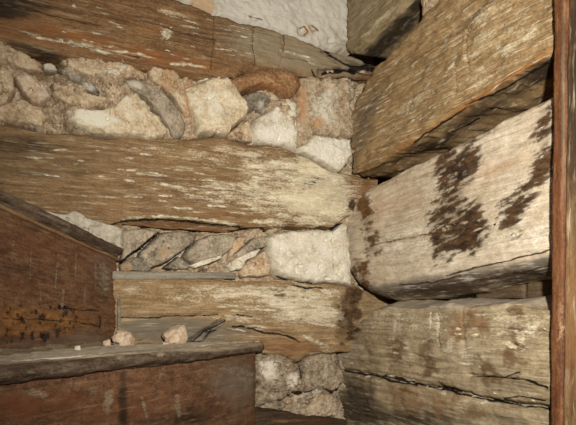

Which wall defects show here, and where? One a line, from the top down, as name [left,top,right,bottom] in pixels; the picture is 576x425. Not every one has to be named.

crack [413,62,549,143]
crack [276,276,322,289]
crack [399,249,550,285]
crack [121,314,300,342]
crack [344,369,550,410]